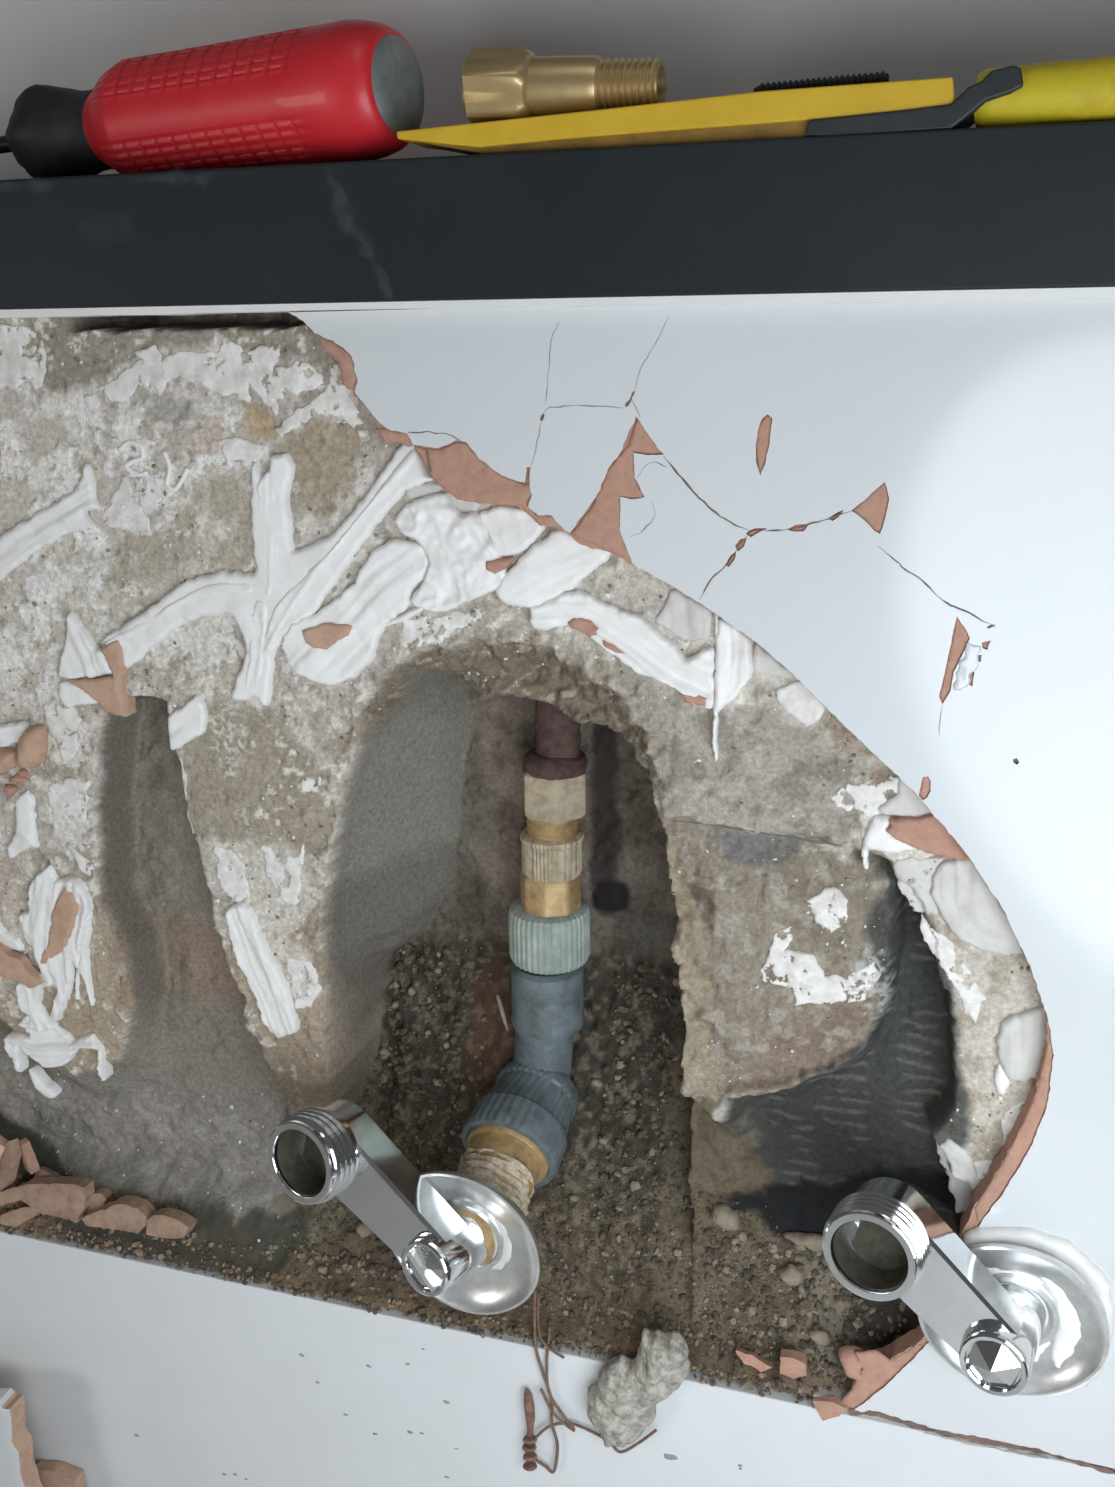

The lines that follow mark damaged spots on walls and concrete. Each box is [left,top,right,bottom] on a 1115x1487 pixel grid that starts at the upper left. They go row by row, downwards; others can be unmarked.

crack [531,319,668,466]
peeling [84,334,663,565]
crack [408,431,461,441]
crack [630,457,851,598]
spalling [852,482,889,533]
crack [878,546,995,629]
spalling [939,617,989,702]
peeling [807,886,848,933]
peeling [831,774,987,1024]
peeling [760,926,881,1006]
spalling [936,1019,1054,1223]
spalling [841,1342,924,1409]